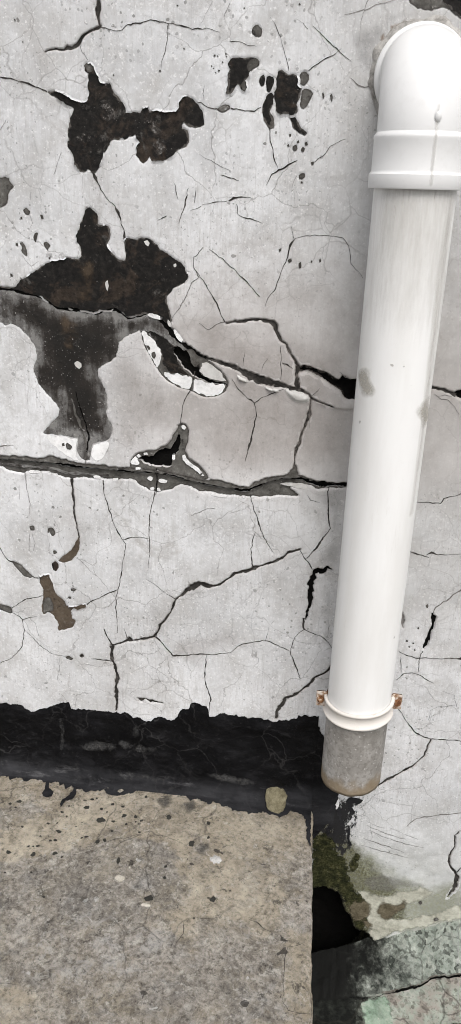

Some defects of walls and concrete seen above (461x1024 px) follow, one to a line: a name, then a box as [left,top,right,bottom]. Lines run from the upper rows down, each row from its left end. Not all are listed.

crack [45,0,255,63]
crack [92,171,127,249]
spalling [48,61,204,173]
crack [159,90,344,223]
spalling [211,53,333,152]
spalling [0,207,347,499]
crack [172,227,363,465]
crack [432,386,461,414]
crack [0,476,332,718]
crack [378,590,461,786]
water stain [296,715,457,931]
crack [361,813,461,897]